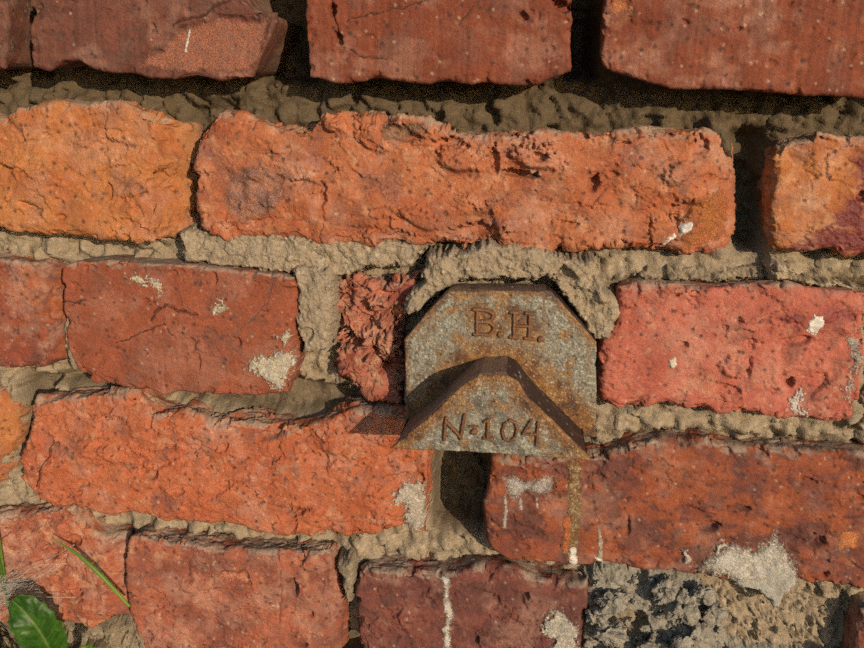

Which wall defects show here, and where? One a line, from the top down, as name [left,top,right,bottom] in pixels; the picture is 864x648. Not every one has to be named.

crack [172,0,231,25]